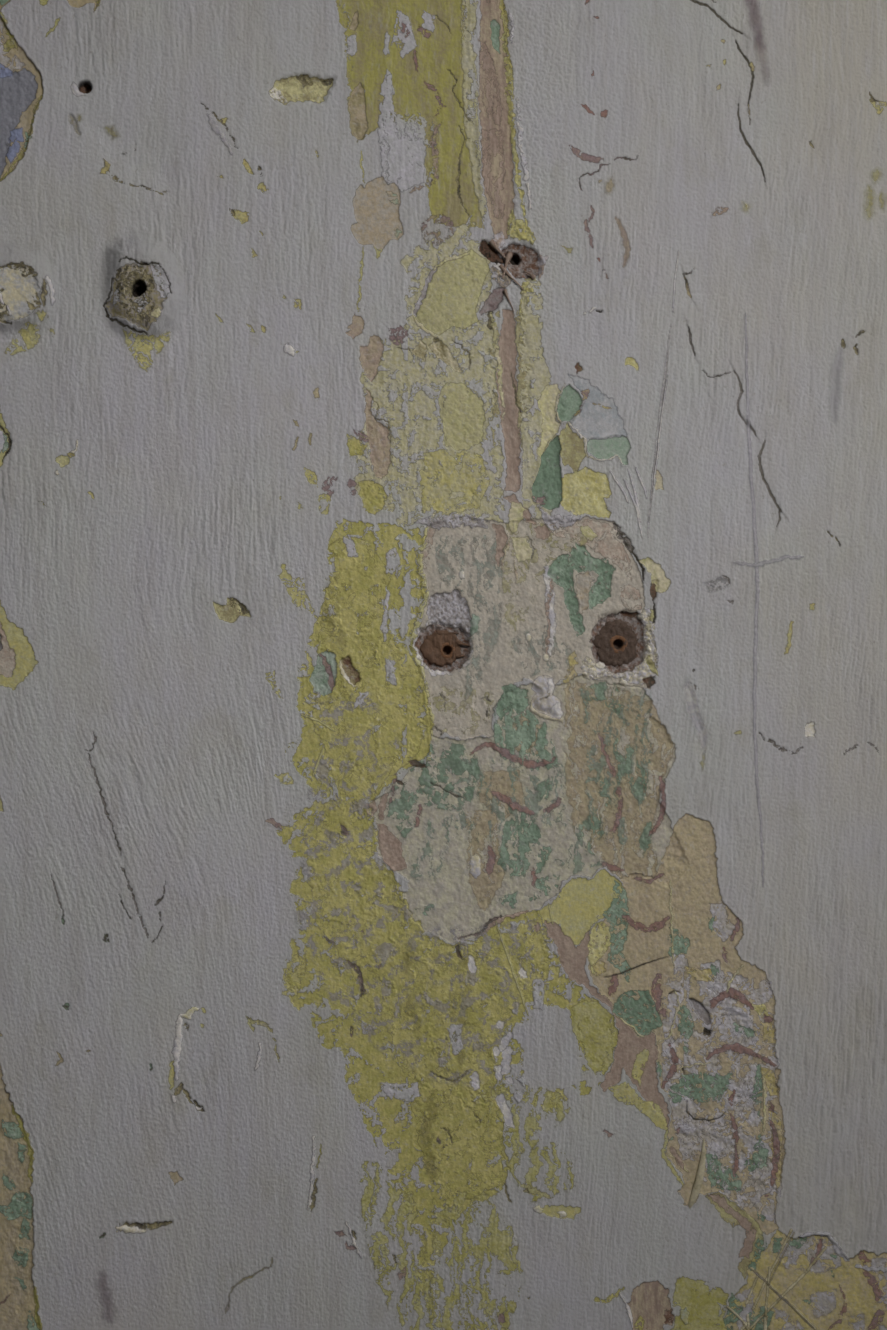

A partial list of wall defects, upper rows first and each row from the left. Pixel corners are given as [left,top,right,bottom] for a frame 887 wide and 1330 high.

peeling [0,0,43,181]
crack [691,0,765,181]
peeling [0,413,12,467]
crack [683,272,782,525]
peeling [0,600,38,690]
peeling [265,0,887,1330]
peeling [0,1065,42,1330]